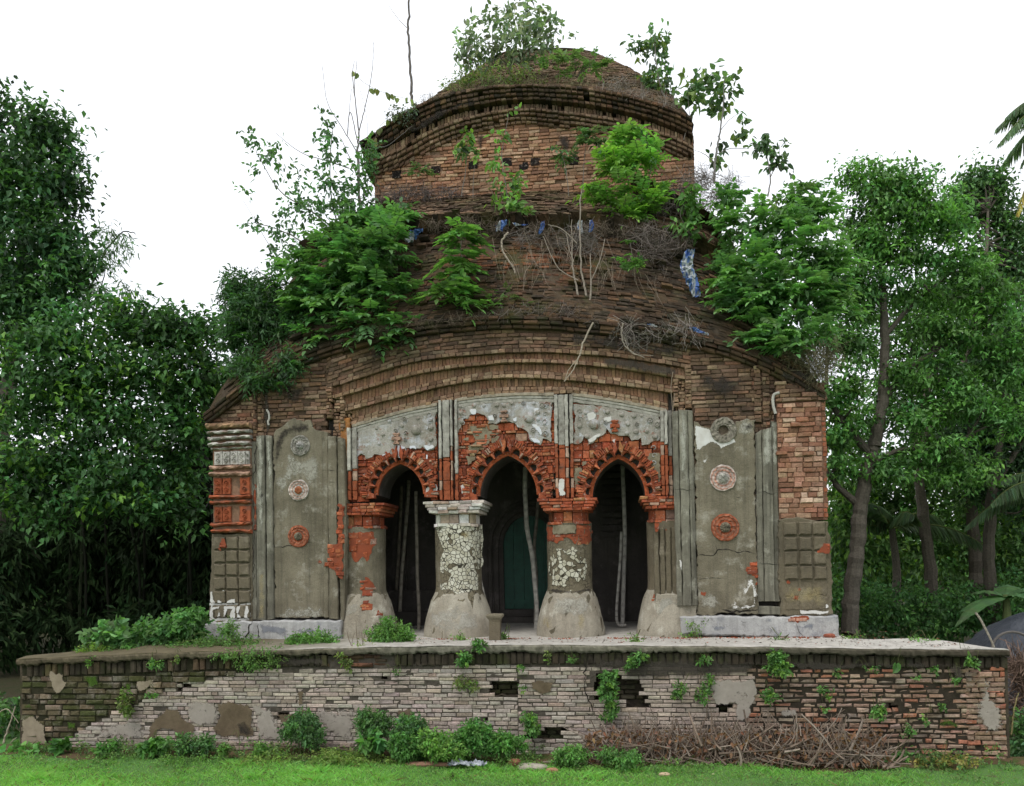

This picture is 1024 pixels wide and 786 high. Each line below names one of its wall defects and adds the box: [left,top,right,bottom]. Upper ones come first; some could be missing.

spalling [370,445,435,469]
spalling [463,409,501,465]
spalling [559,461,586,496]
spalling [648,453,661,483]
peeling [695,426,735,463]
spalling [318,504,377,579]
crack [697,471,779,579]
spalling [746,562,758,585]